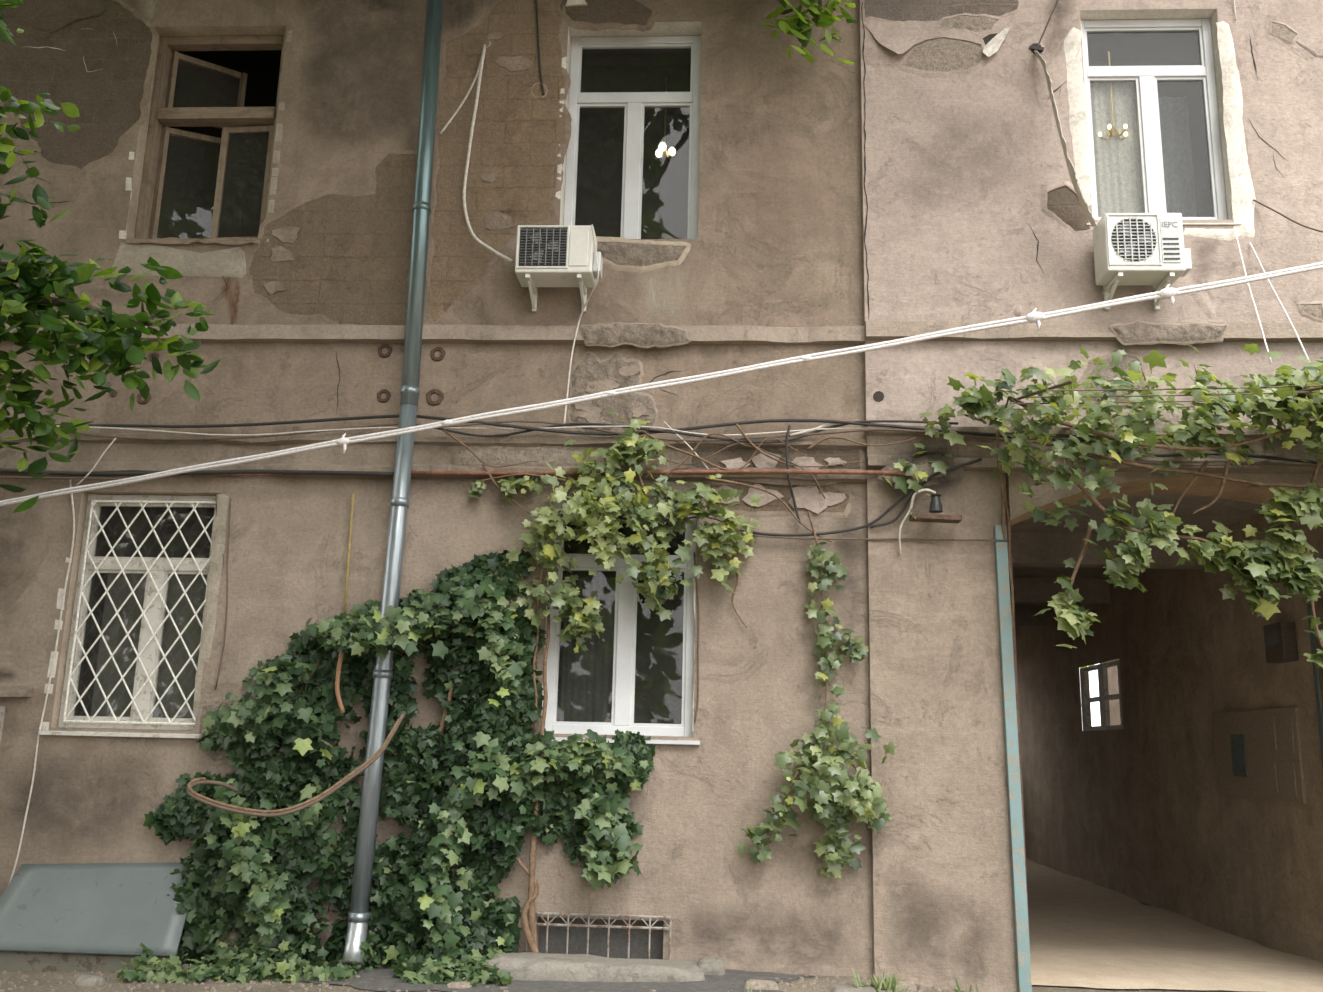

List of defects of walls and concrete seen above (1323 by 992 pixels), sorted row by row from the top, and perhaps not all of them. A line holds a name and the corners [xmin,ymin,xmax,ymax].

spalling [0,0,158,176]
spalling [861,0,1021,78]
crack [1296,41,1323,57]
spalling [424,0,657,325]
crack [1251,123,1285,178]
spalling [246,149,417,325]
spalling [1040,181,1094,234]
spalling [449,322,690,466]
spalling [686,435,964,520]